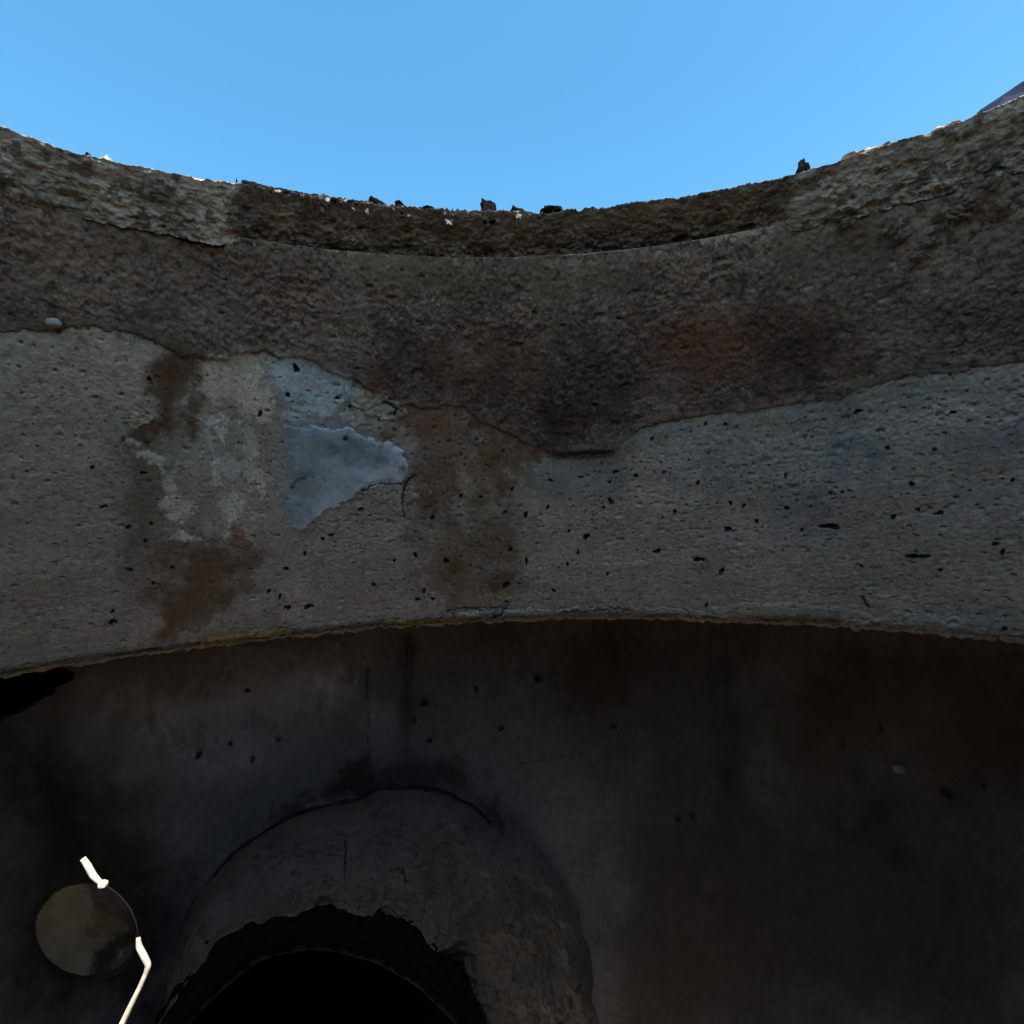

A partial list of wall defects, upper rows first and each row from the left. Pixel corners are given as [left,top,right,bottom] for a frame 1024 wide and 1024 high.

water stain [126,346,354,543]
peeling [0,172,1024,531]